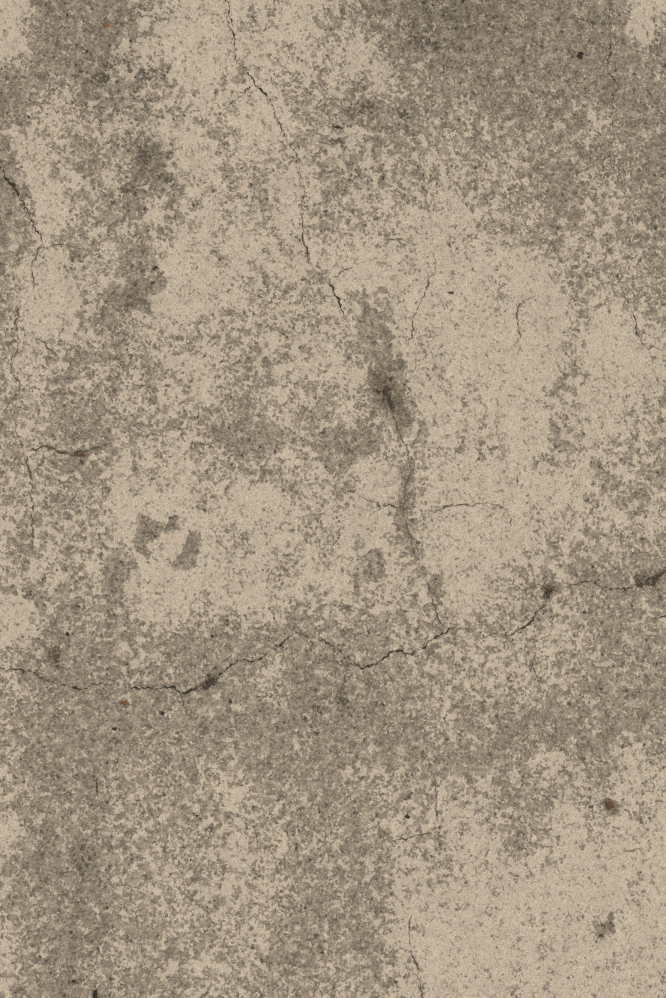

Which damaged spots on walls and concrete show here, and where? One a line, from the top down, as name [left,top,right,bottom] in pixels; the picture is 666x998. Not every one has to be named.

crack [0,164,106,555]
crack [222,0,354,320]
crack [385,236,413,244]
crack [388,256,437,373]
crack [0,413,666,711]
crack [407,912,426,998]